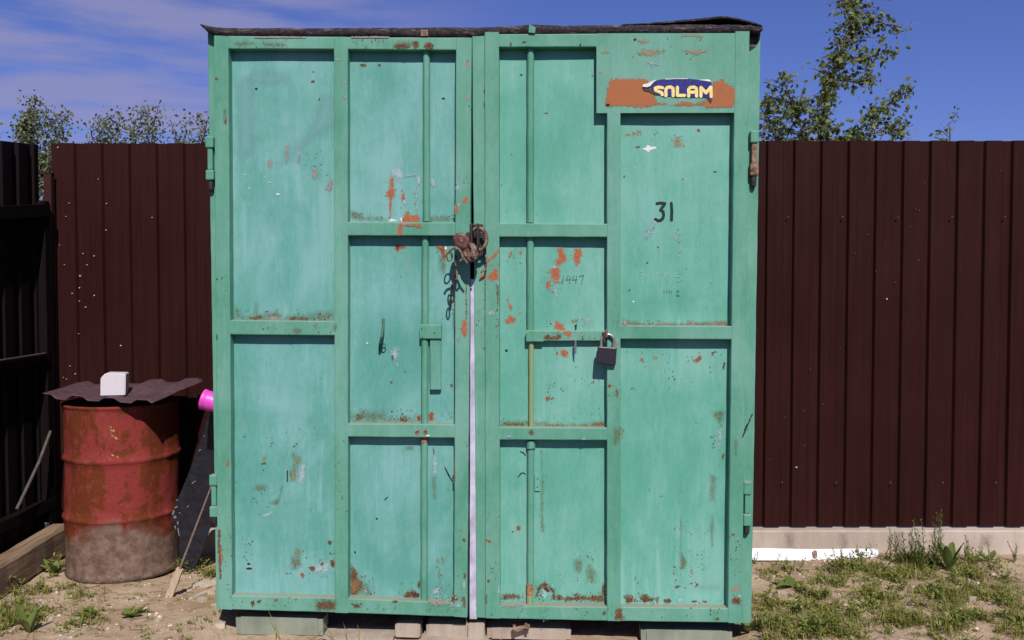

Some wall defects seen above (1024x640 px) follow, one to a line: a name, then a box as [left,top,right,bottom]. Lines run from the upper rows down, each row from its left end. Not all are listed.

peeling [592,71,735,109]
corrosion [234,310,332,335]
corrosion [350,409,452,423]
corrosion [350,557,466,612]
corrosion [485,550,625,622]